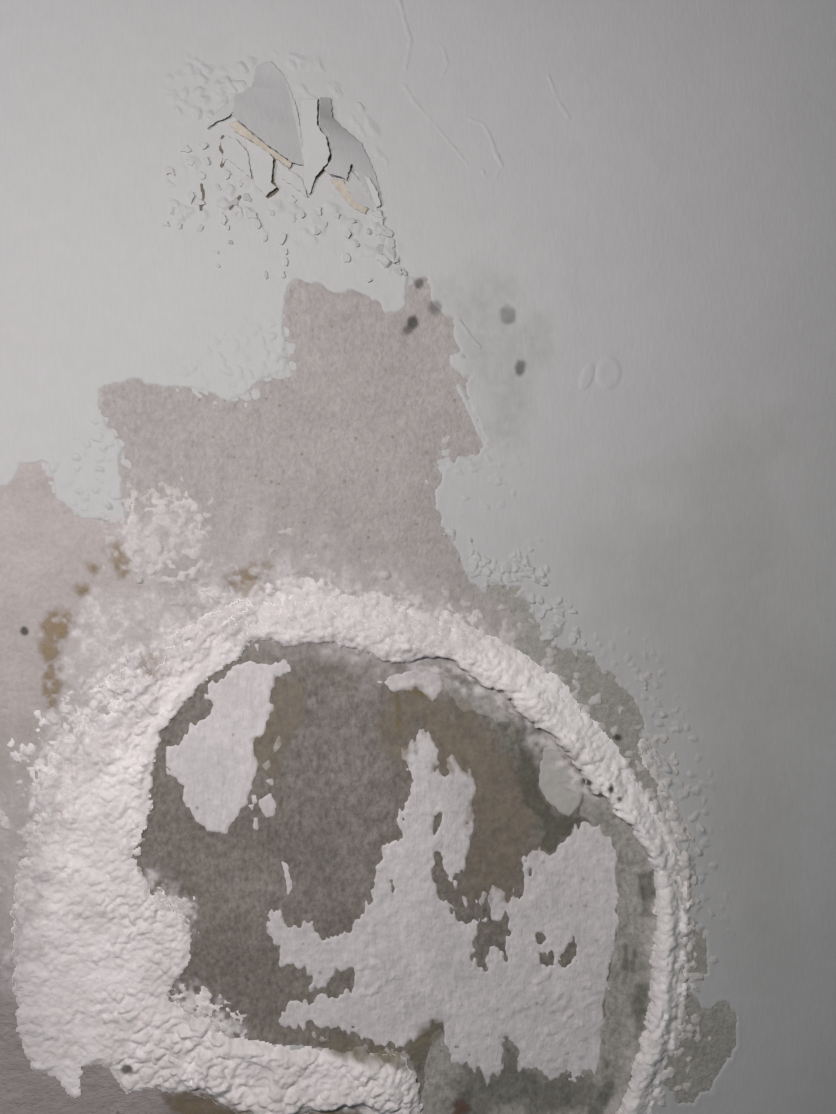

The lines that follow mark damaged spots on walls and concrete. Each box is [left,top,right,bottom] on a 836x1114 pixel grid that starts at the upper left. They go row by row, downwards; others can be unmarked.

flaking render [0,46,662,1114]
water stain [0,477,719,1114]
flaking render [660,919,737,1103]